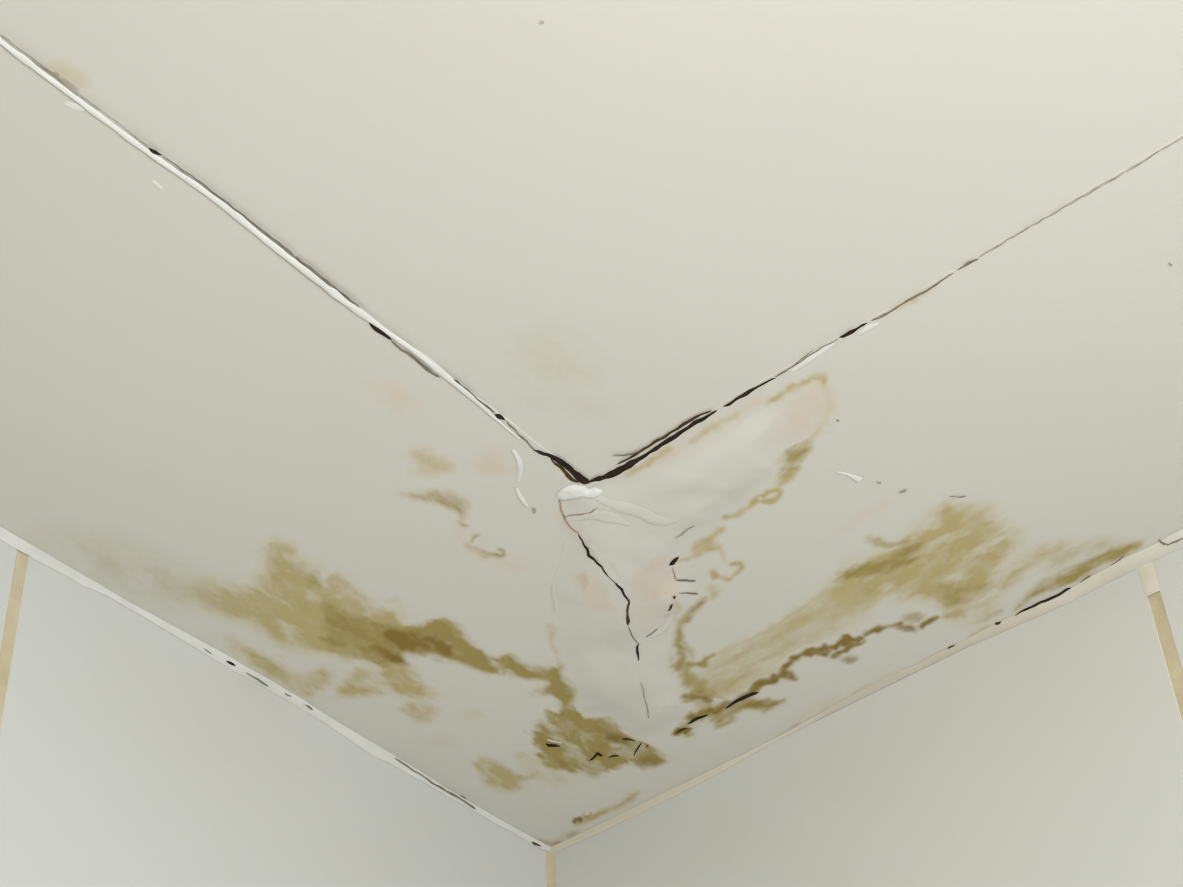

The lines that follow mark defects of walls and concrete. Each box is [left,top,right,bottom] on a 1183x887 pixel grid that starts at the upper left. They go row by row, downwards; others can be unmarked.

damp [889,281,938,313]
crack [0,34,1183,719]
damp [8,369,1153,798]
crack [676,692,759,733]
crack [546,739,562,747]
crack [589,738,649,761]
damp [529,786,647,847]